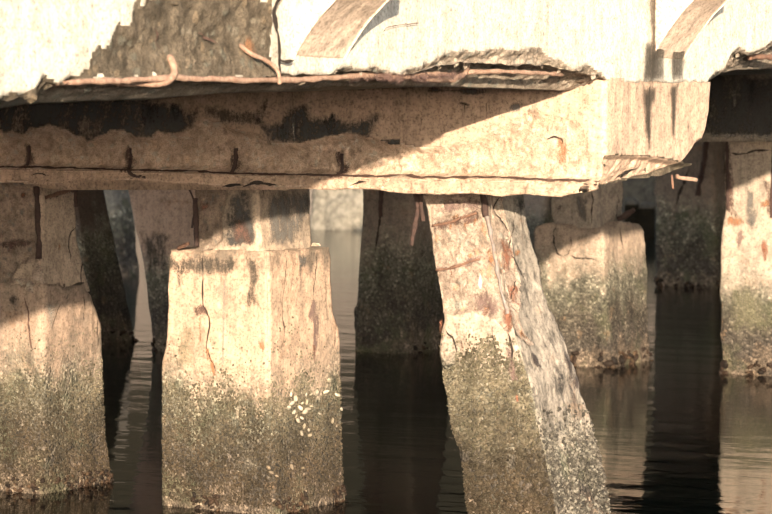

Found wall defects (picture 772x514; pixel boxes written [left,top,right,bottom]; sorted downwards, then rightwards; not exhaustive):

spalling [0,0,606,104]
spalling [714,43,772,75]
damp [0,100,378,143]
damp [704,75,772,138]
crack [0,166,594,223]
spalling [0,108,709,347]
rust [435,199,487,236]
rust [465,240,520,270]
crack [467,197,521,302]
crack [24,298,33,350]
crack [195,257,216,371]
rust [475,285,519,330]